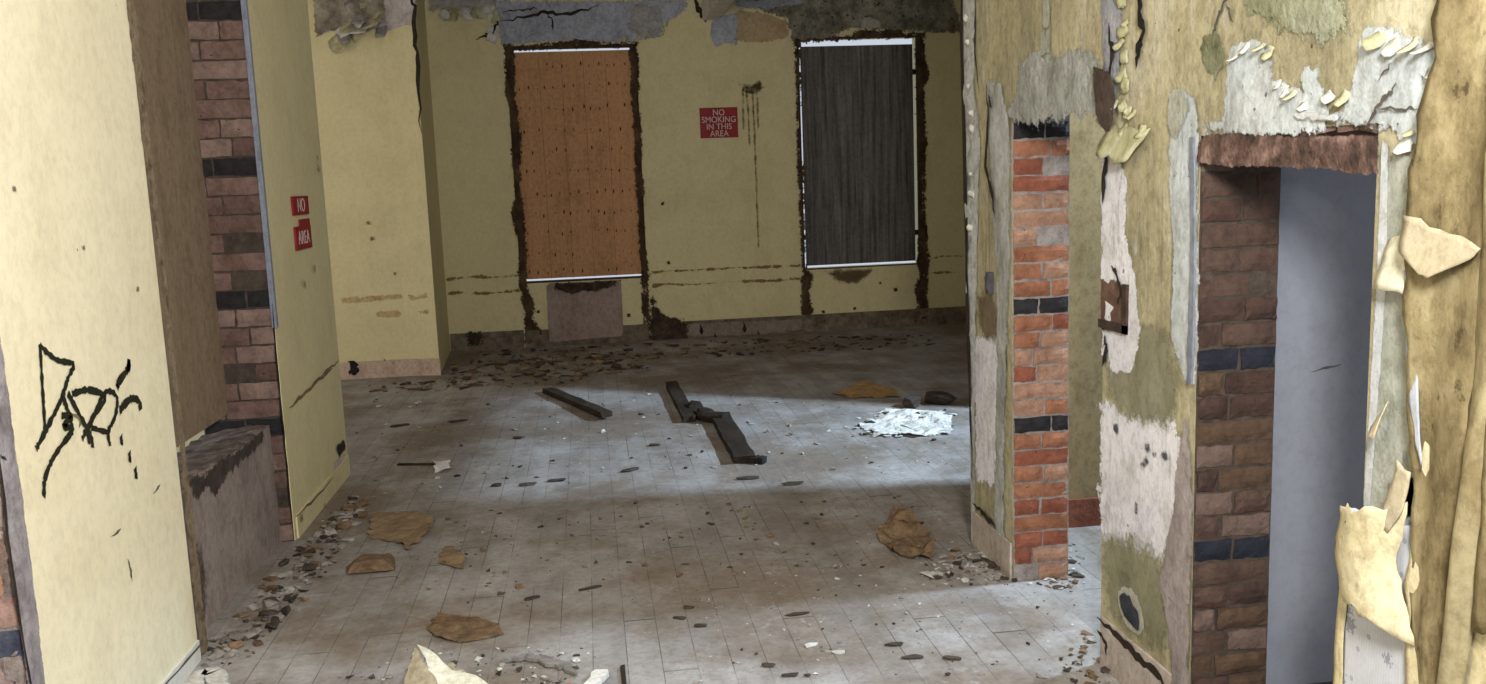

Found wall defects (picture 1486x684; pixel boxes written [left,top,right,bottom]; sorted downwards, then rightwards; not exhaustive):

crack [476,5,598,40]
crack [694,0,706,22]
flaking render [313,0,688,347]
crack [960,0,995,450]
crack [0,455,32,684]
flaking render [0,340,45,684]
crack [272,304,338,535]
crack [973,503,996,530]
flaking render [710,0,1435,684]
crack [1097,617,1164,684]